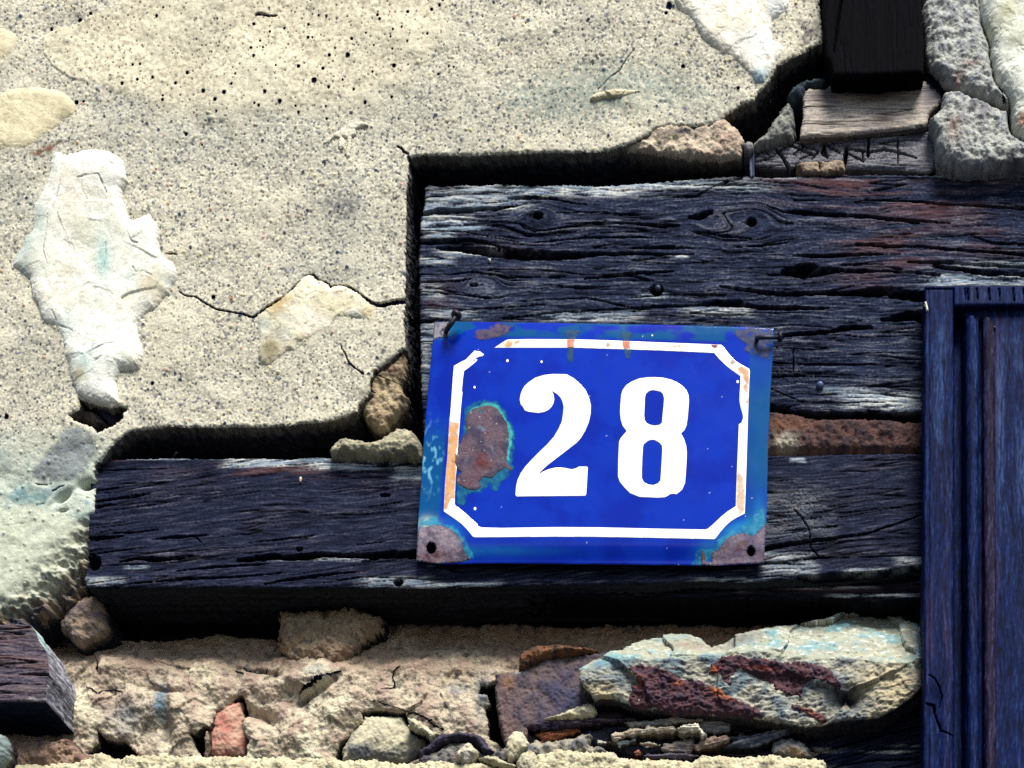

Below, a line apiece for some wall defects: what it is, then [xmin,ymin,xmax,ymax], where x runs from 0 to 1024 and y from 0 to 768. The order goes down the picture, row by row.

crack [179,274,406,319]
corrosion [628,654,841,724]
peeling [408,718,441,745]
spalling [455,731,538,768]